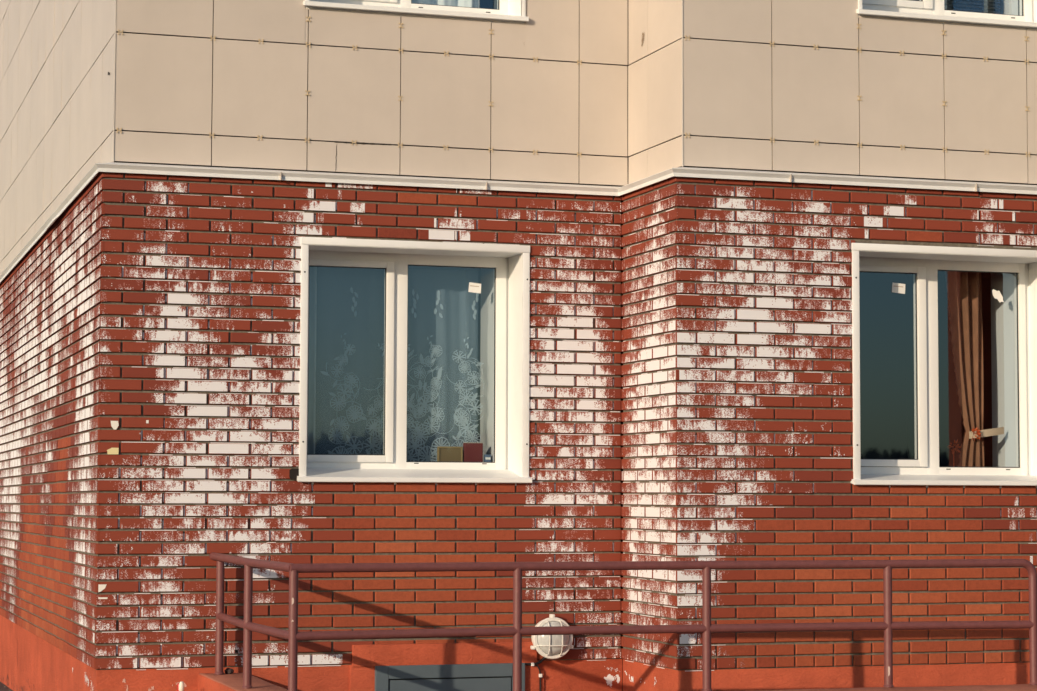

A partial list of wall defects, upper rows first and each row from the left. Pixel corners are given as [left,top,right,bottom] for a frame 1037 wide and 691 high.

damp [0,180,1037,691]